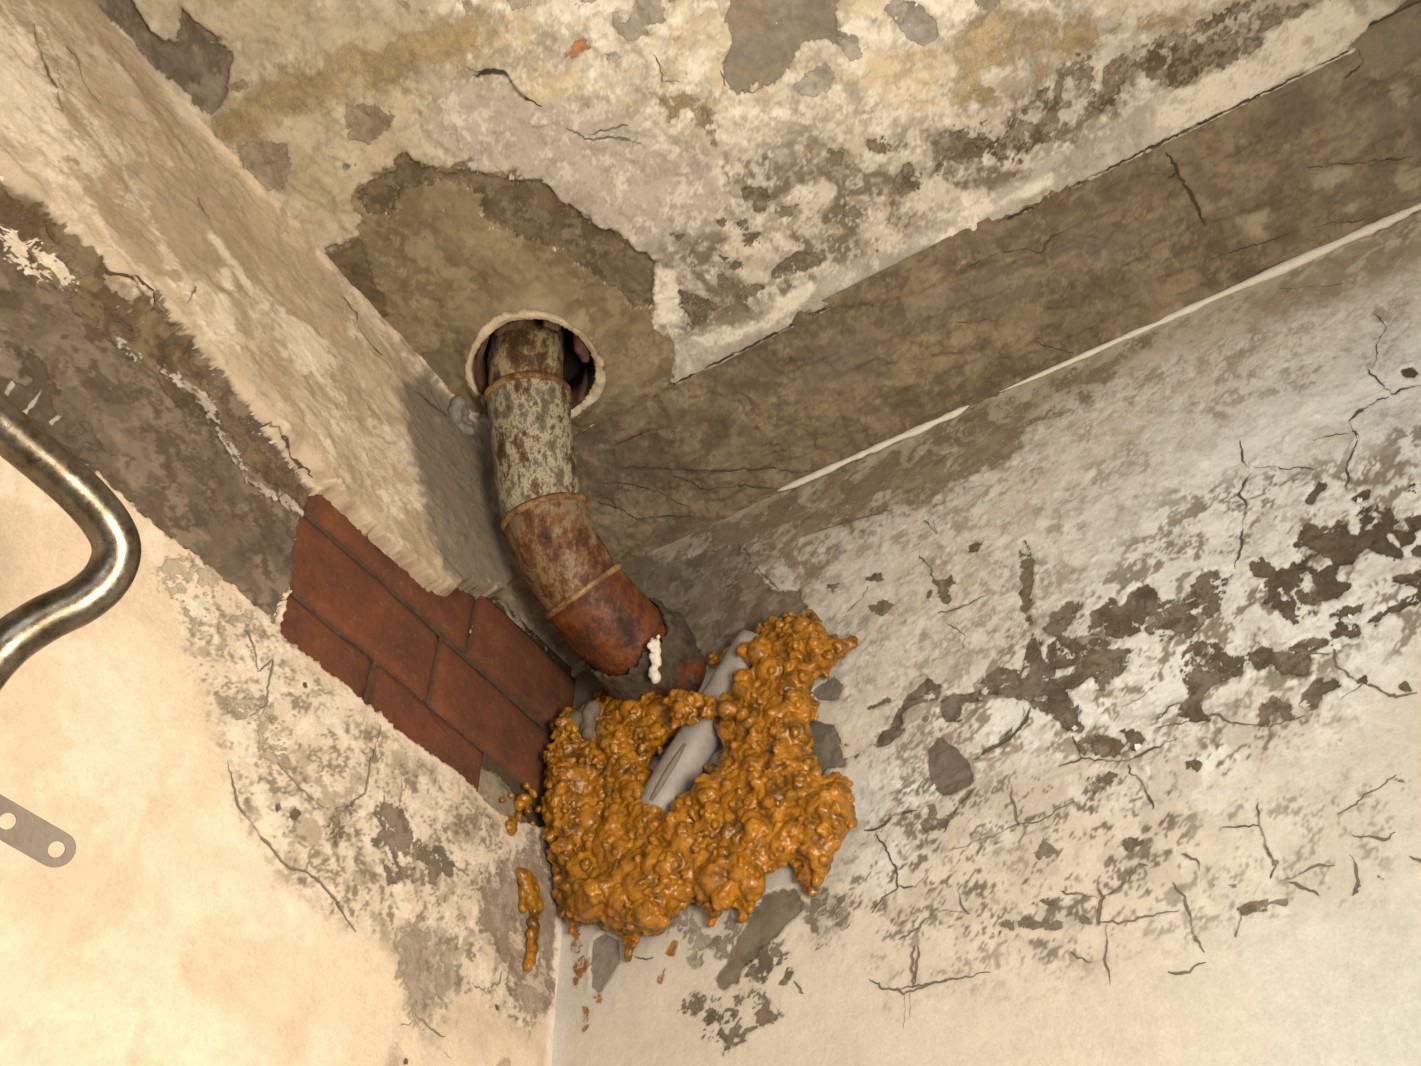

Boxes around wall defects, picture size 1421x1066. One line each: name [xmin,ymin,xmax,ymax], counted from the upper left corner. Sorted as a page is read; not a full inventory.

spalling [723,0,863,97]
spalling [358,153,658,309]
crack [968,47,1364,269]
crack [1234,314,1416,567]
flaking render [0,225,576,827]
peeling [866,489,1421,832]
spalling [809,721,859,776]
rust [571,929,590,988]
rust [657,940,678,984]
crack [864,707,1075,1015]
crack [1061,853,1242,979]
crack [1222,775,1421,896]